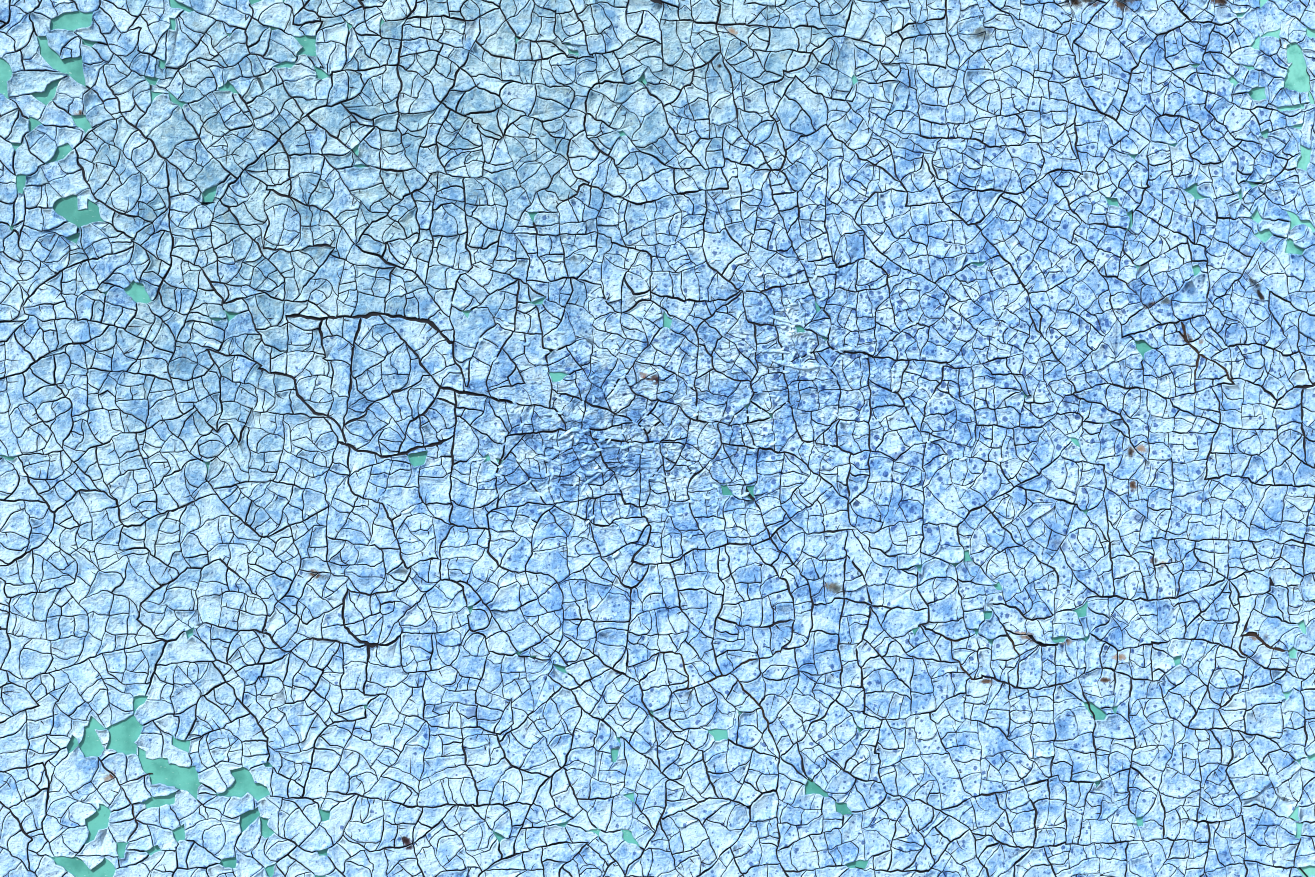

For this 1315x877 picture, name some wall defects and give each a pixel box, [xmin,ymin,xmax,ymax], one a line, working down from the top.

crack [0,0,57,34]
crack [109,5,160,52]
crack [86,107,203,187]
peeling [0,0,352,250]
peeling [1110,0,1315,280]
peeling [102,262,170,323]
peeling [1115,330,1161,369]
peeling [1171,262,1209,303]
crack [136,0,1153,877]
crack [0,454,198,577]
crack [0,601,66,724]
peeling [0,610,371,877]